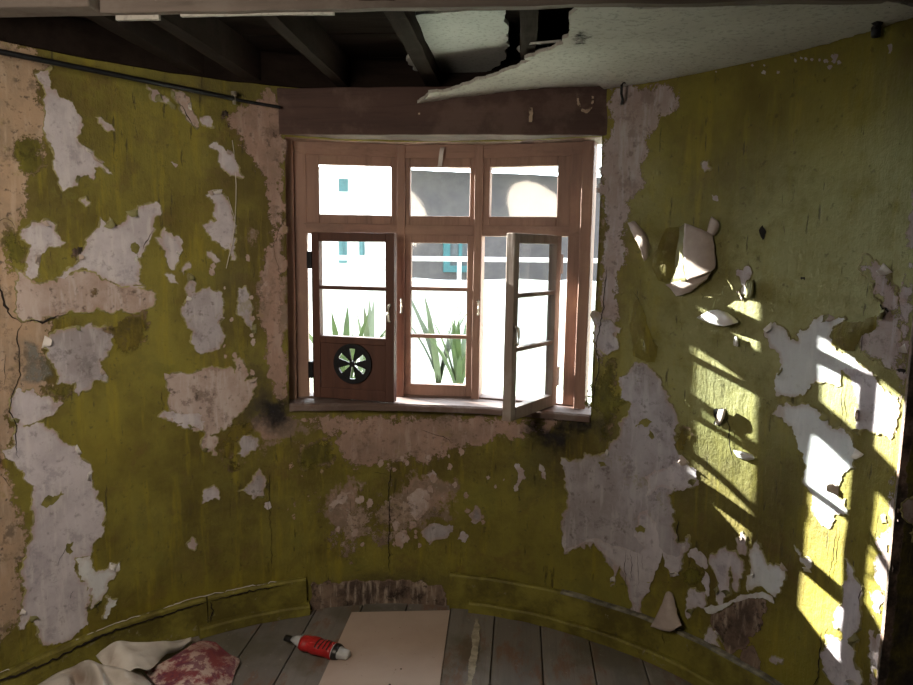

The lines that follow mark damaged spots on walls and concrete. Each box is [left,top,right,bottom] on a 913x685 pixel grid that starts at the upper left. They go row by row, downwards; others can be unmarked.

peeling [0,41,289,646]
flaking render [292,413,560,565]
flaking render [590,83,681,363]
peeling [560,361,788,670]
peeling [794,544,813,573]
peeling [763,253,913,530]